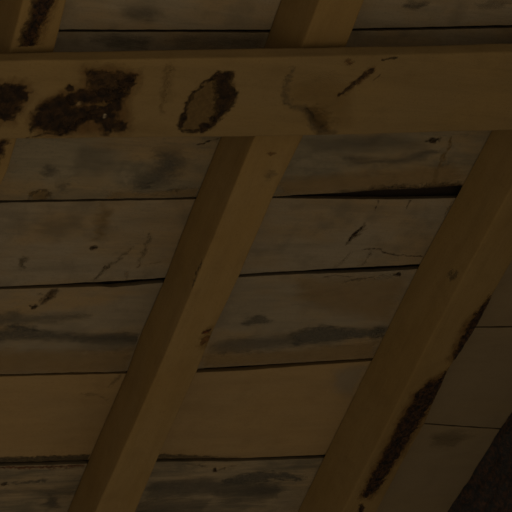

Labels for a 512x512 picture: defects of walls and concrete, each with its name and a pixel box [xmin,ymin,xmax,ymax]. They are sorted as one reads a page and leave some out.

water stain [207,326,385,364]